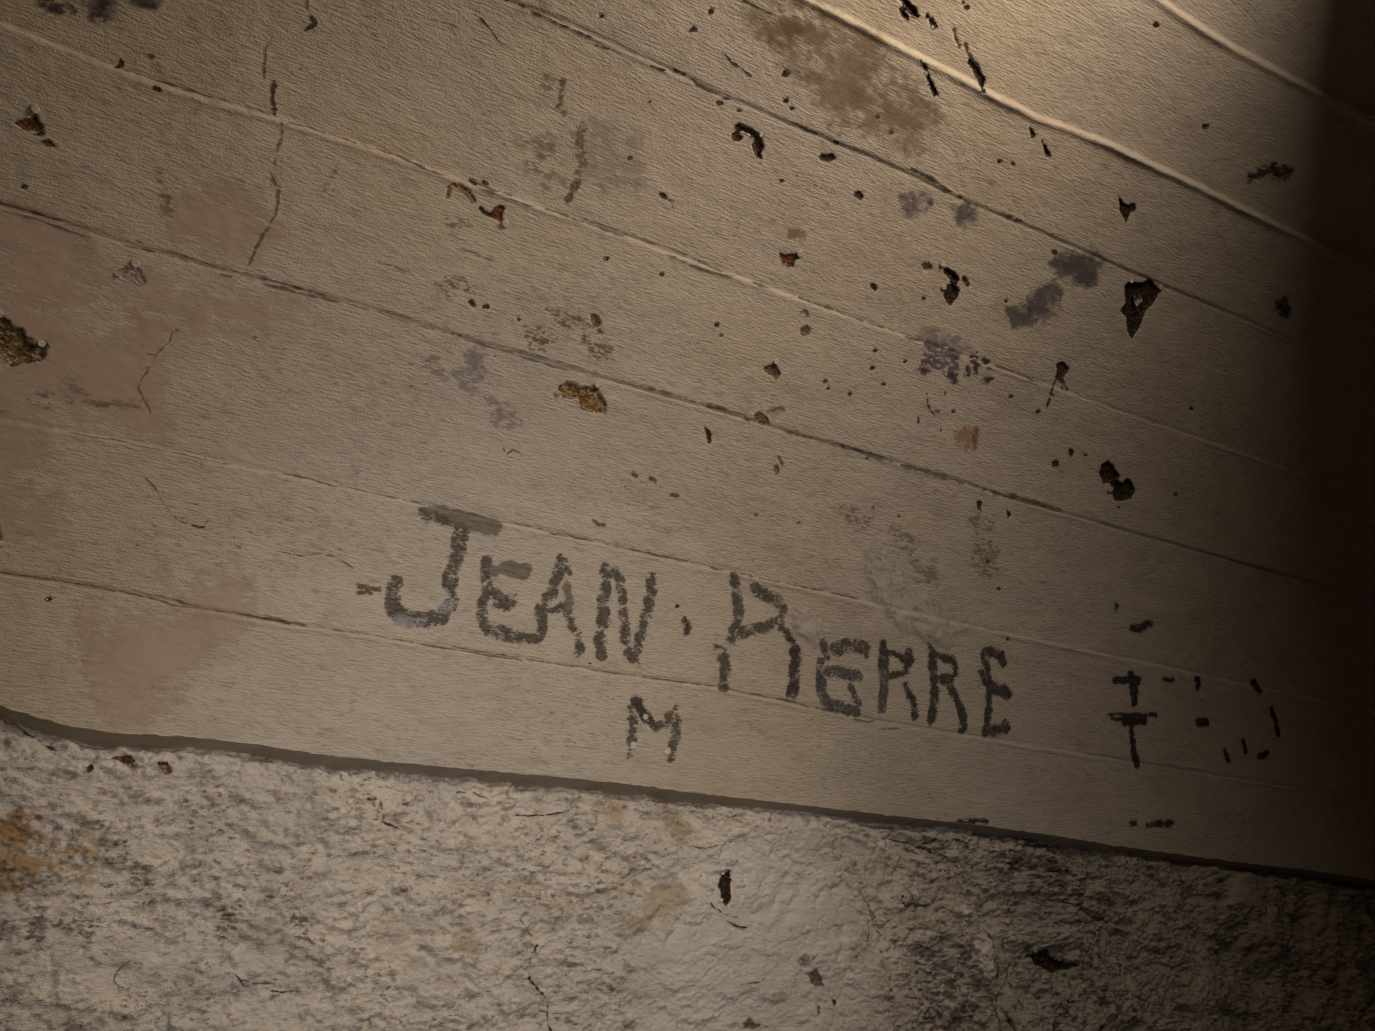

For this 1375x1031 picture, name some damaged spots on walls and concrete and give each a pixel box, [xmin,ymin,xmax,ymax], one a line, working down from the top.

leakage [36,0,160,25]
spalling [716,101,765,159]
crack [0,201,90,238]
crack [122,0,952,414]
crack [910,167,1023,222]
spalling [940,261,970,305]
spalling [1120,278,1164,338]
spalling [555,381,609,415]
crack [918,392,946,431]
crack [785,431,1063,510]
spalling [1052,448,1135,508]
spalling [719,867,732,905]